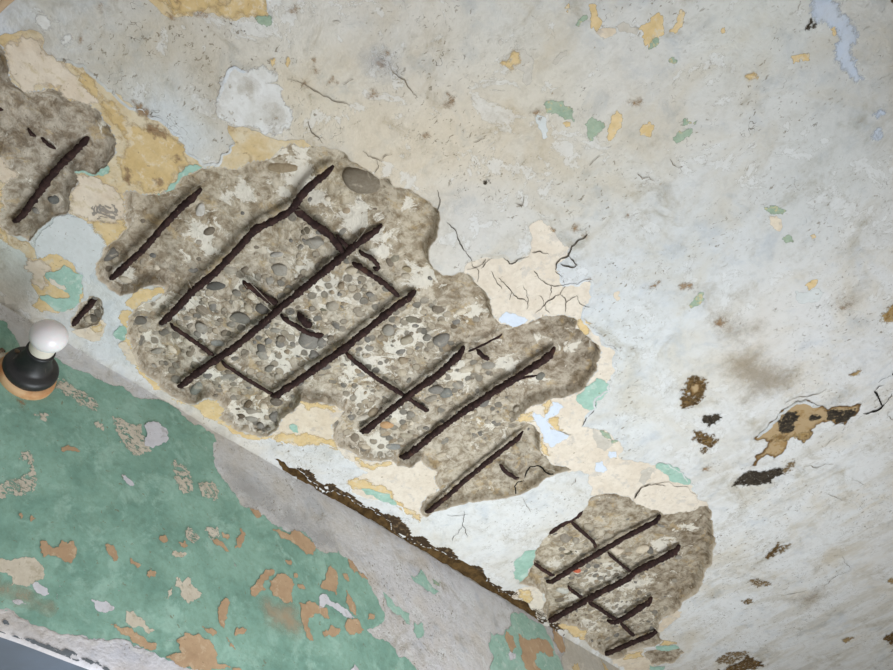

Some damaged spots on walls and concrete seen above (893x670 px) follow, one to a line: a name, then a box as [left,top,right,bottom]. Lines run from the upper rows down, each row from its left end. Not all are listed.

peeling [149,0,275,27]
peeling [576,4,685,50]
peeling [809,0,863,82]
crack [437,190,588,312]
spalling [0,12,717,670]